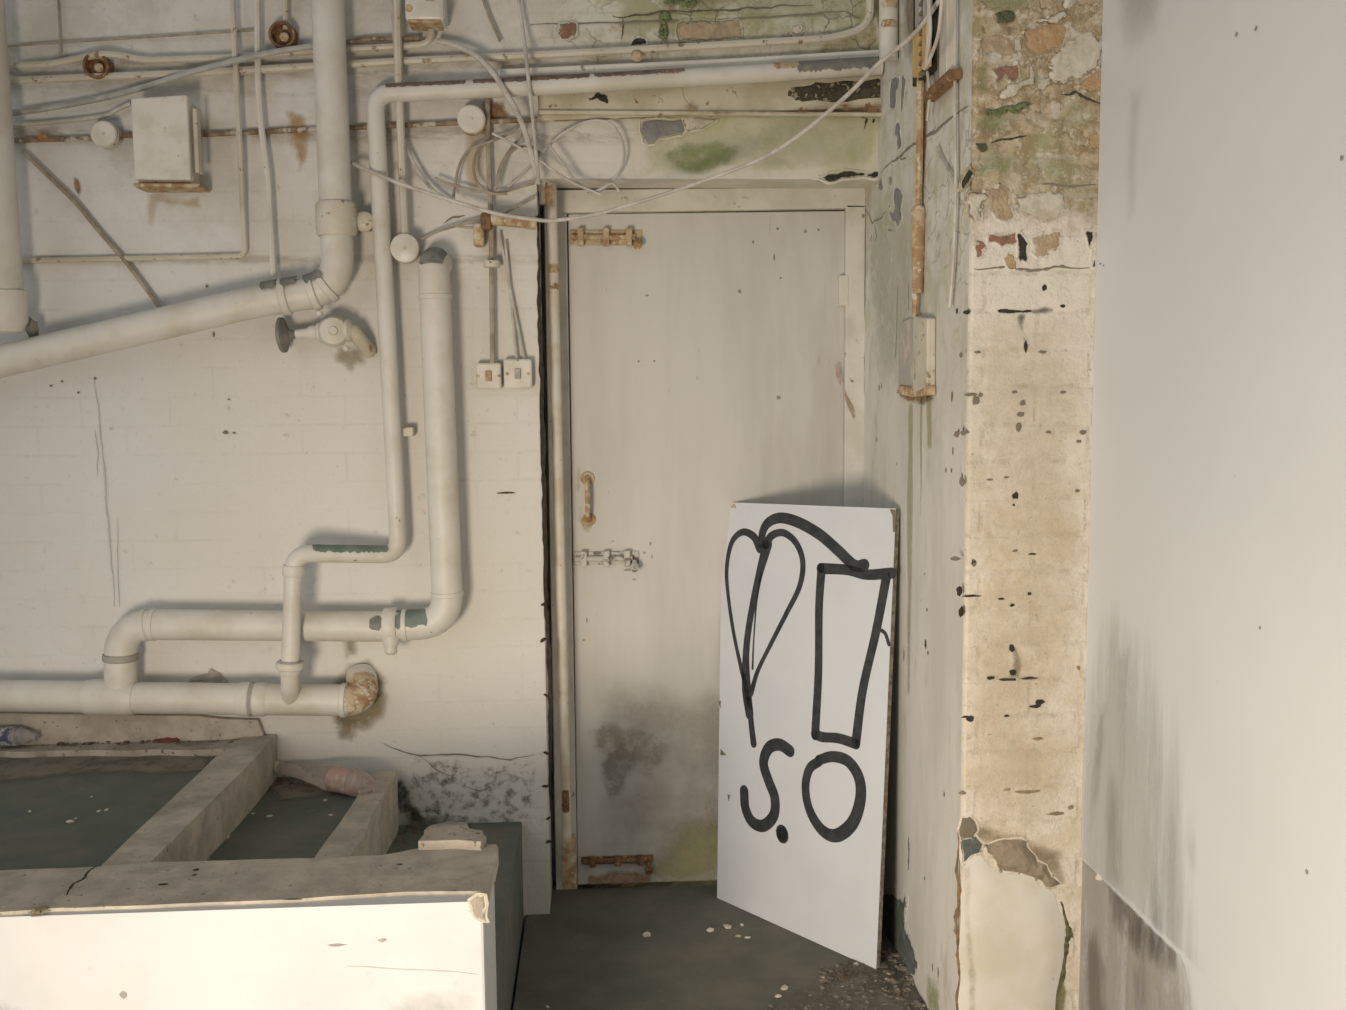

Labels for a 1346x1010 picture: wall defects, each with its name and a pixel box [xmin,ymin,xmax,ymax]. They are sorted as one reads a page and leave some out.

spalling [556,21,579,41]
spalling [674,17,744,43]
spalling [977,8,1072,85]
corrosion [292,117,306,157]
spalling [959,164,1063,273]
crack [383,191,554,851]
corrosion [338,672,383,736]
damp [398,766,529,825]
crack [66,866,97,895]
flaking render [957,815,1063,889]
damp [1115,895,1175,958]
damp [1089,946,1098,1010]